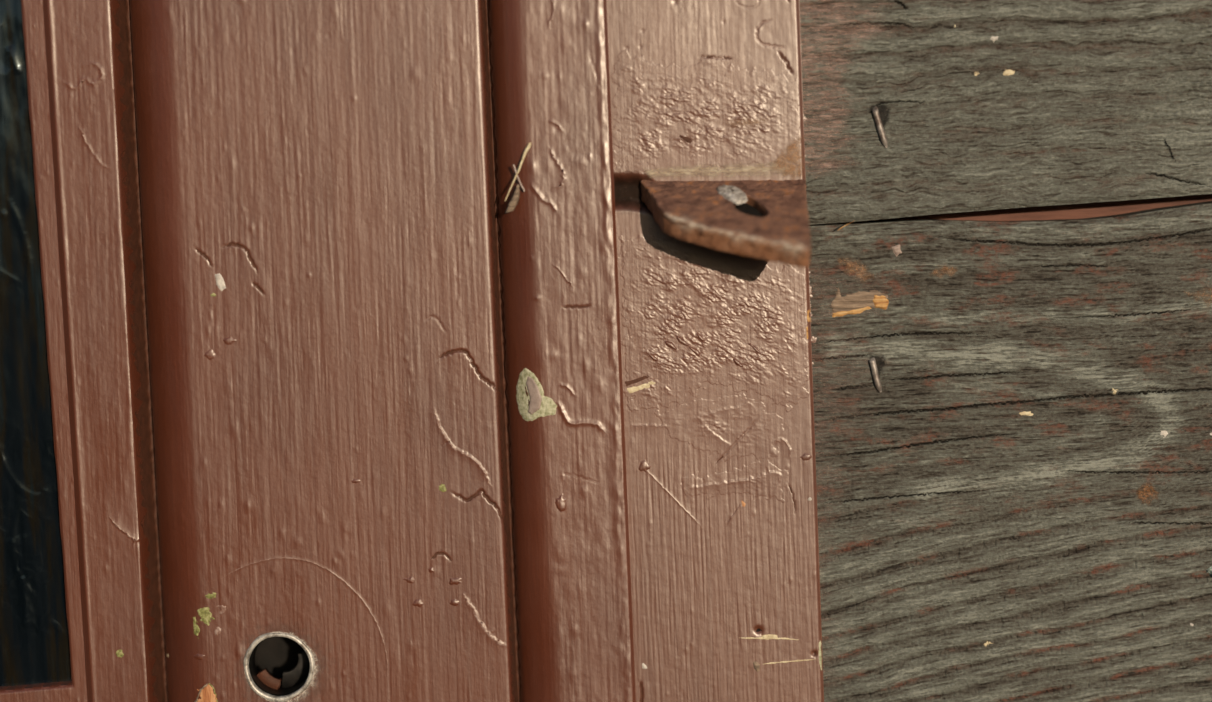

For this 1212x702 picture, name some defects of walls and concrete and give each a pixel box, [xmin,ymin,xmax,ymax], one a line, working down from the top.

crack [424,316,497,390]
peeling [516,368,557,421]
peeling [194,683,218,702]